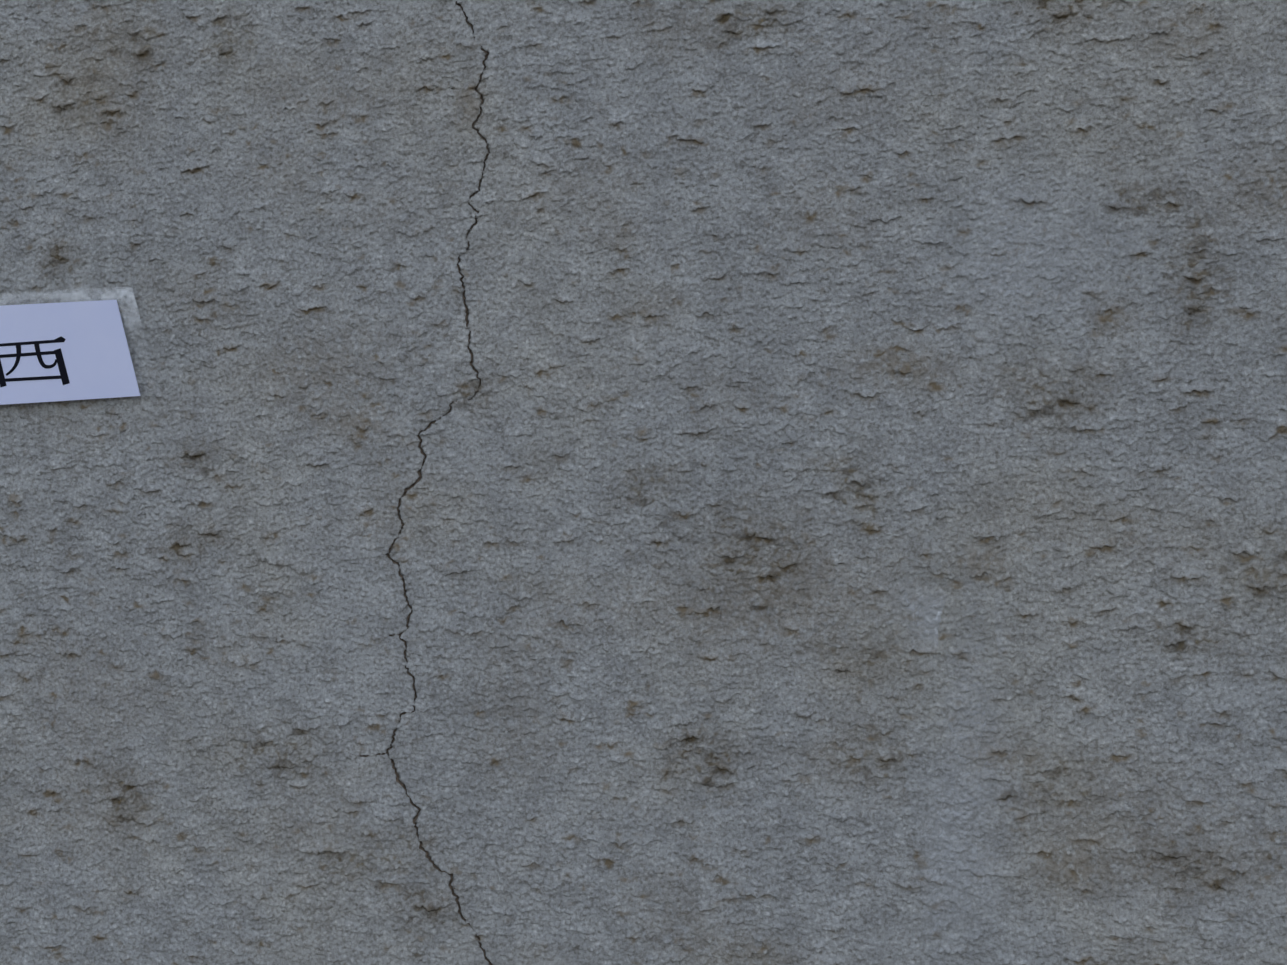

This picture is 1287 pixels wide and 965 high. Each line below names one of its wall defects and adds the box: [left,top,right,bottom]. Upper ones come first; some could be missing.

crack [346,1,493,965]